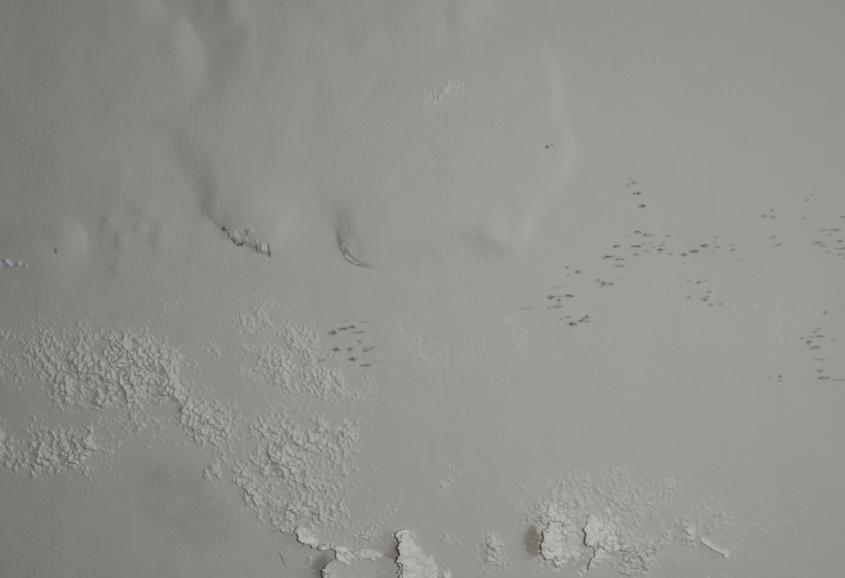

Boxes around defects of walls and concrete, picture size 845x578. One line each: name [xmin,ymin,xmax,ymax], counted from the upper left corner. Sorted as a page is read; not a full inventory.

peeling [271,517,452,578]
peeling [527,487,625,578]